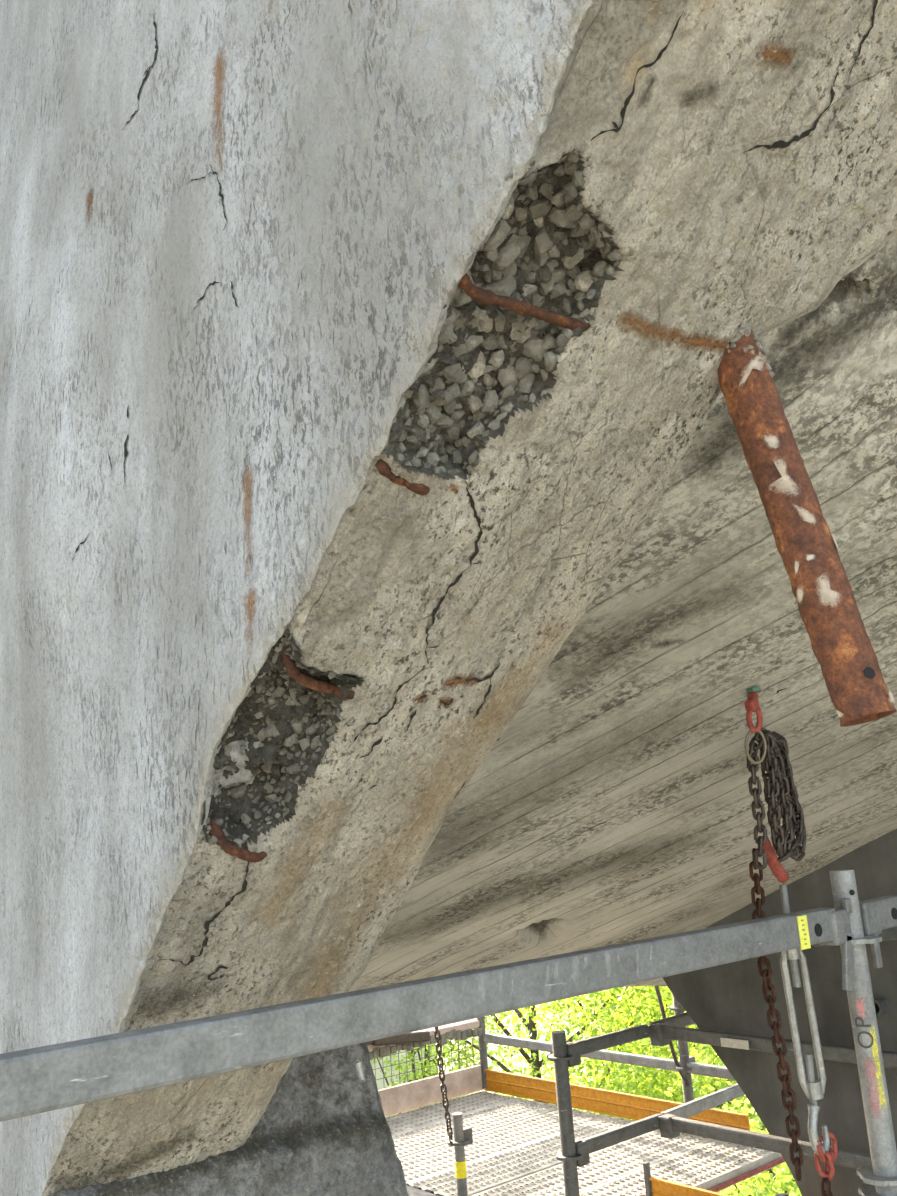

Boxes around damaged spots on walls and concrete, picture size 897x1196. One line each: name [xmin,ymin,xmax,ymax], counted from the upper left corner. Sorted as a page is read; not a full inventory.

crack [122,15,158,130]
rust [214,57,224,142]
crack [590,11,684,141]
rust [761,45,791,65]
crack [743,0,878,153]
spalling [382,149,624,480]
rust [620,313,730,351]
rust [244,470,252,557]
rust [246,592,254,633]
crack [348,481,500,758]
spalling [201,628,365,851]
crack [161,862,249,980]